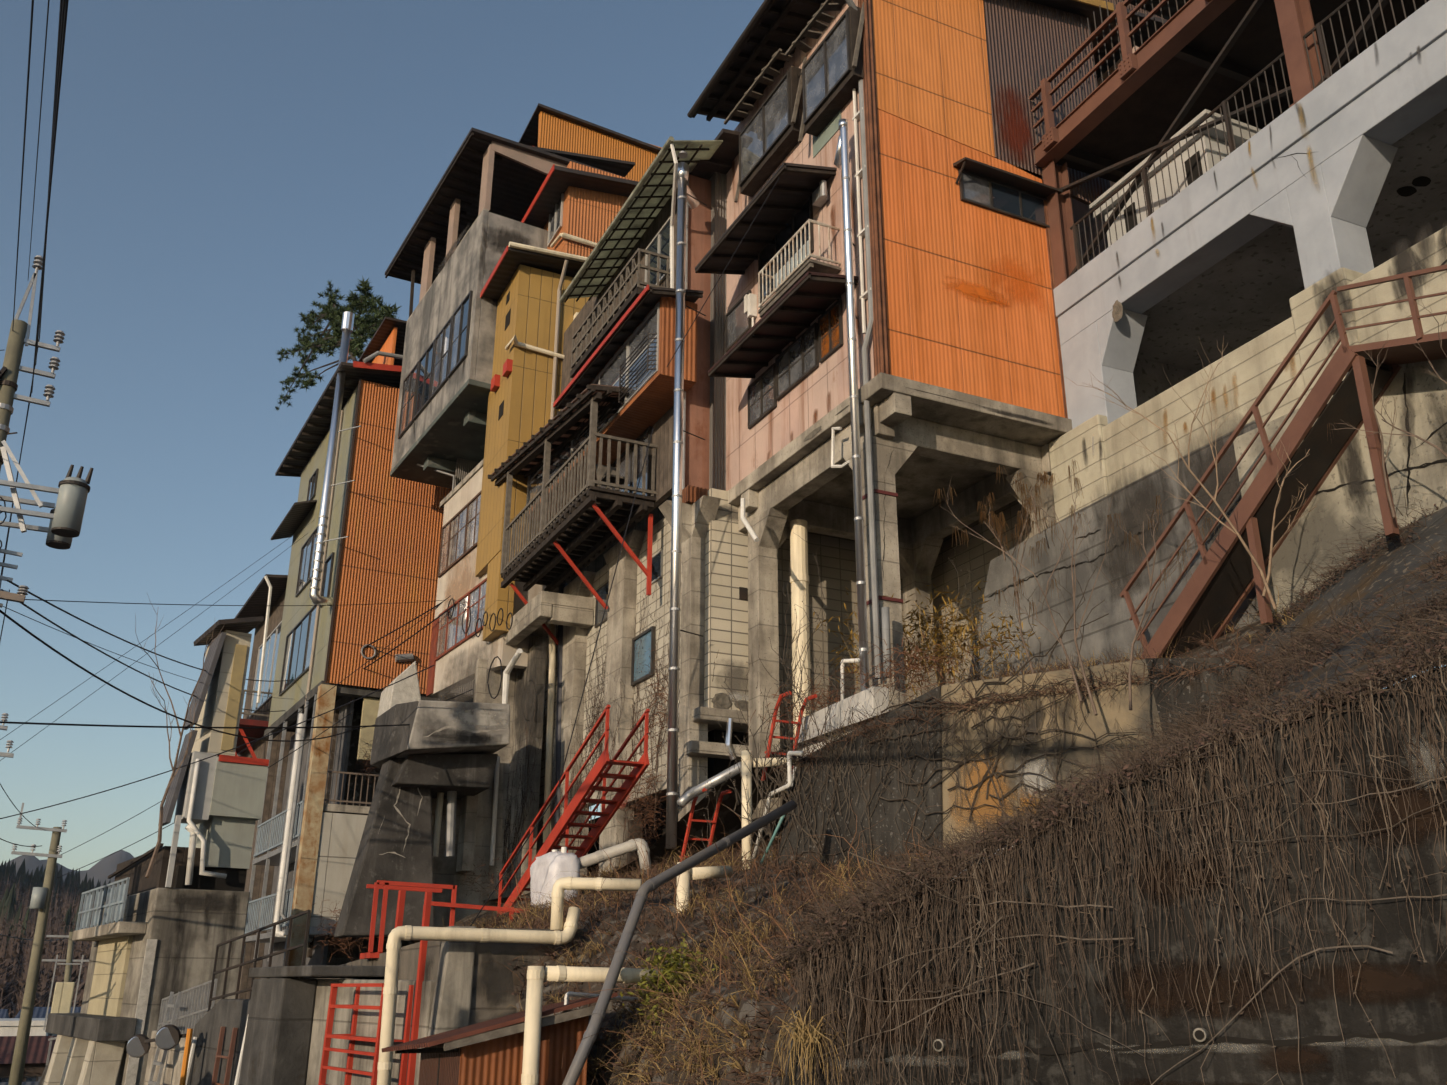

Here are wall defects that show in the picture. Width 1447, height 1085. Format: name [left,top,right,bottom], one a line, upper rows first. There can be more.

rust [1000,91,1031,160]
crack [1315,374,1447,507]
crack [378,787,423,858]